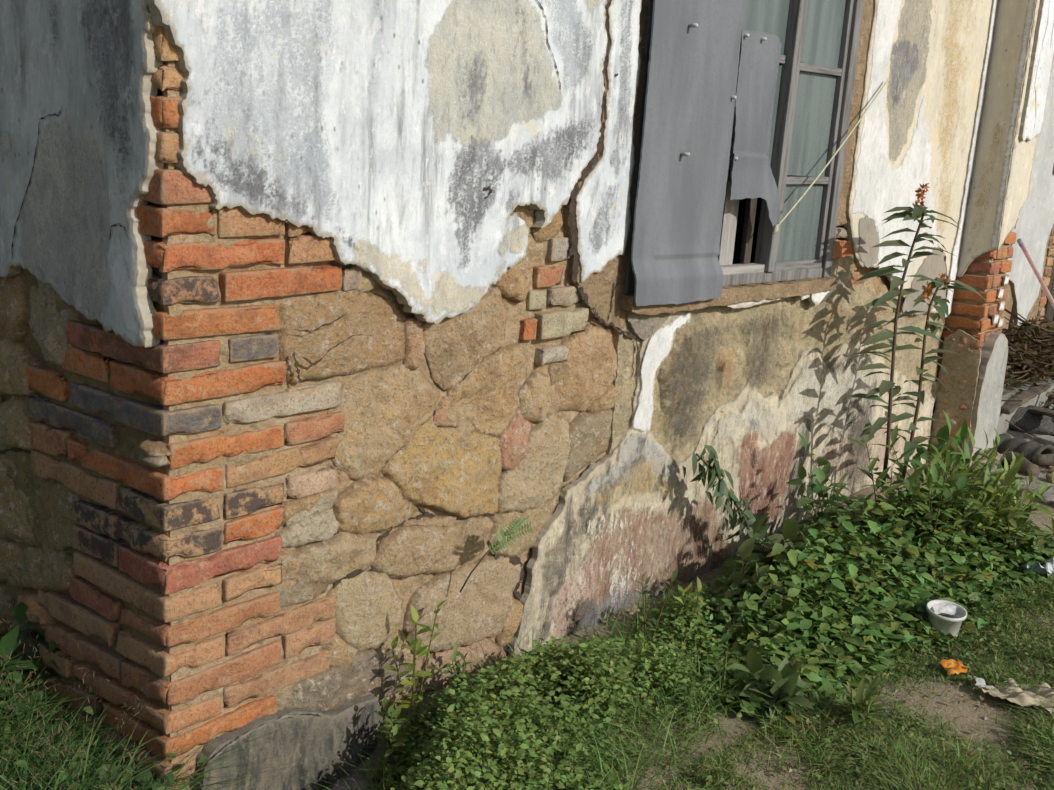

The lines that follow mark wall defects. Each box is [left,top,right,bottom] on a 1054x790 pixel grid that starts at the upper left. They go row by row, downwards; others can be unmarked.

peeling [425,0,562,151]
crack [11,108,62,257]
water stain [447,116,592,268]
crack [568,0,639,381]
spalling [569,0,1019,496]
spalling [1027,225,1054,326]
spalling [0,26,640,790]
peeling [713,353,901,526]
water stain [843,380,877,495]
water stain [539,438,669,644]